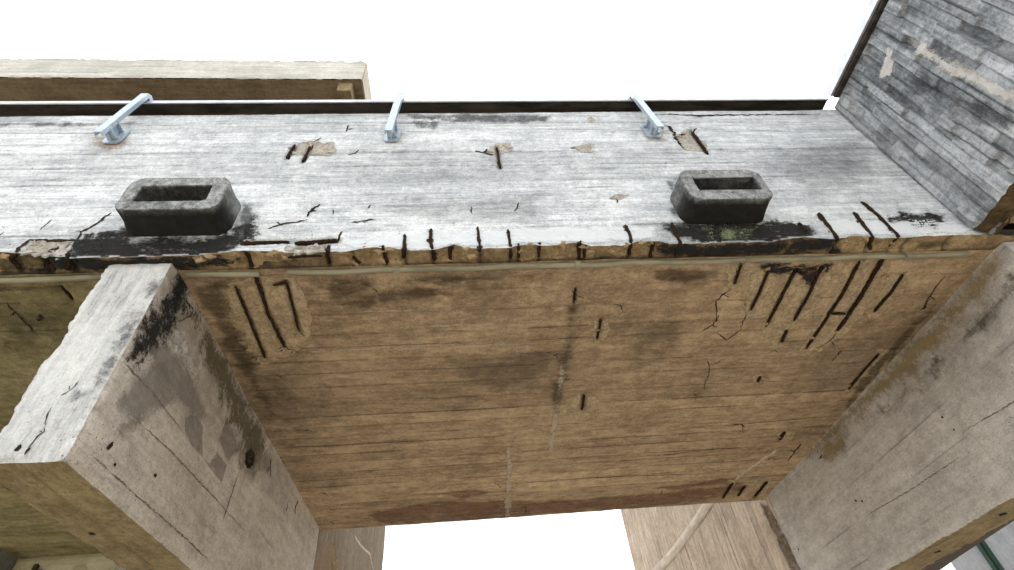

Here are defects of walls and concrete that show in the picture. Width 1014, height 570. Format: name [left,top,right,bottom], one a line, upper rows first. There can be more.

spalling [286,141,337,163]
spalling [486,143,514,169]
spalling [571,143,594,153]
spalling [676,129,709,155]
water stain [888,210,944,227]
water stain [645,202,840,286]
spalling [0,183,1014,365]
water stain [41,205,267,404]
crack [703,288,750,340]